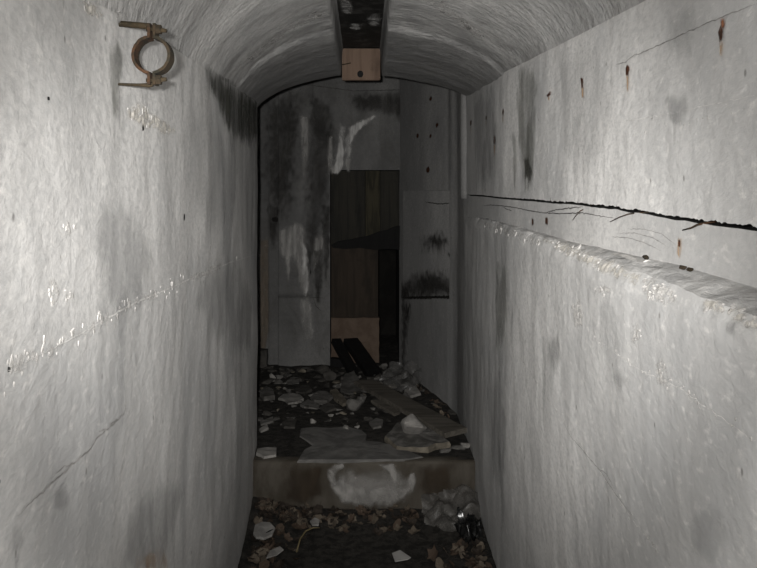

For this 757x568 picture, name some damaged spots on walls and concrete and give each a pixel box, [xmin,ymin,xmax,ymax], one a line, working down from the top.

crack [616,5,752,65]
water stain [211,77,257,143]
water stain [329,96,400,173]
crack [468,194,757,251]
water stain [270,223,329,334]
crack [18,409,126,516]